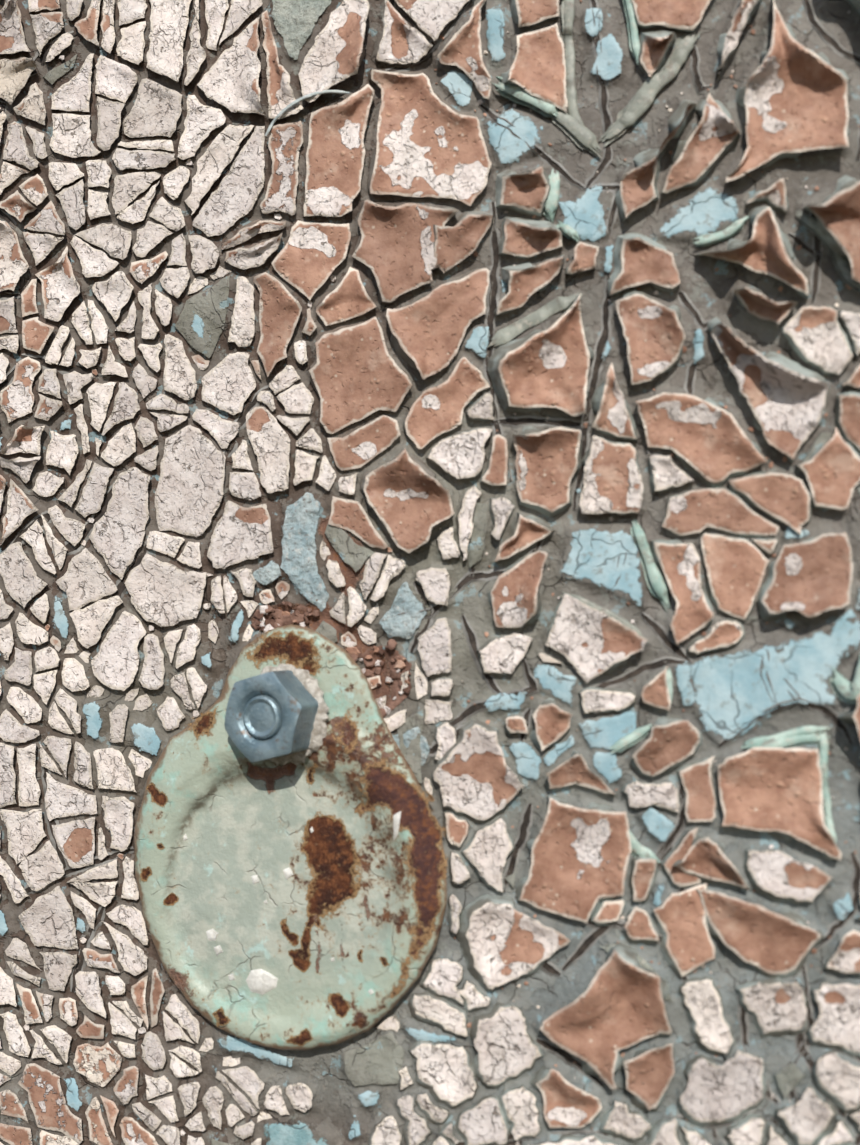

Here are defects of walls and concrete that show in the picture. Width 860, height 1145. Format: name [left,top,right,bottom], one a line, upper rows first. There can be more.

peeling [615,0,850,300]
crack [0,353,116,399]
peeling [0,0,711,743]
crack [483,202,613,510]
crack [24,767,134,895]
peeling [202,1056,327,1145]
corrosion [280,811,370,972]
corrosion [328,993,350,1018]
corrosion [329,710,359,754]
corrosion [354,758,448,1001]
crack [395,526,543,757]
peeling [343,287,860,1145]